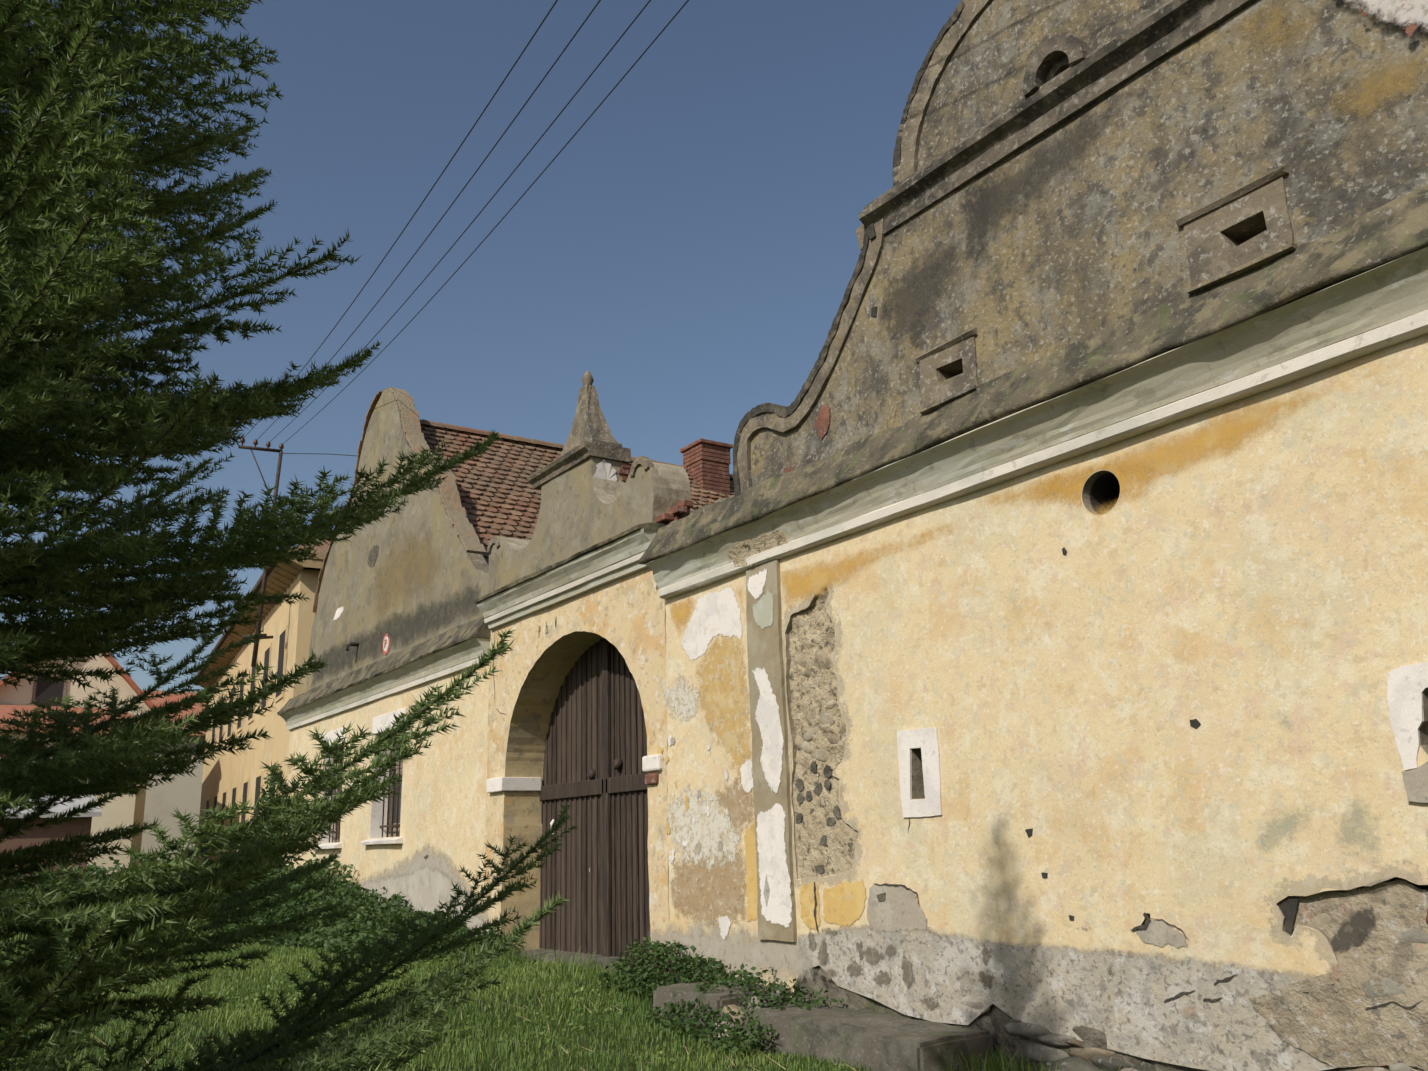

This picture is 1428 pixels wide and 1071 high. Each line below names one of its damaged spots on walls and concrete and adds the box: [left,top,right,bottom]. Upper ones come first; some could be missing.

flaking render [1348,0,1428,41]
flaking render [681,569,927,940]
peeling [658,822,723,867]
flaking render [796,965,1209,1071]
flaking render [1131,912,1189,948]
flaking render [1249,861,1428,1071]